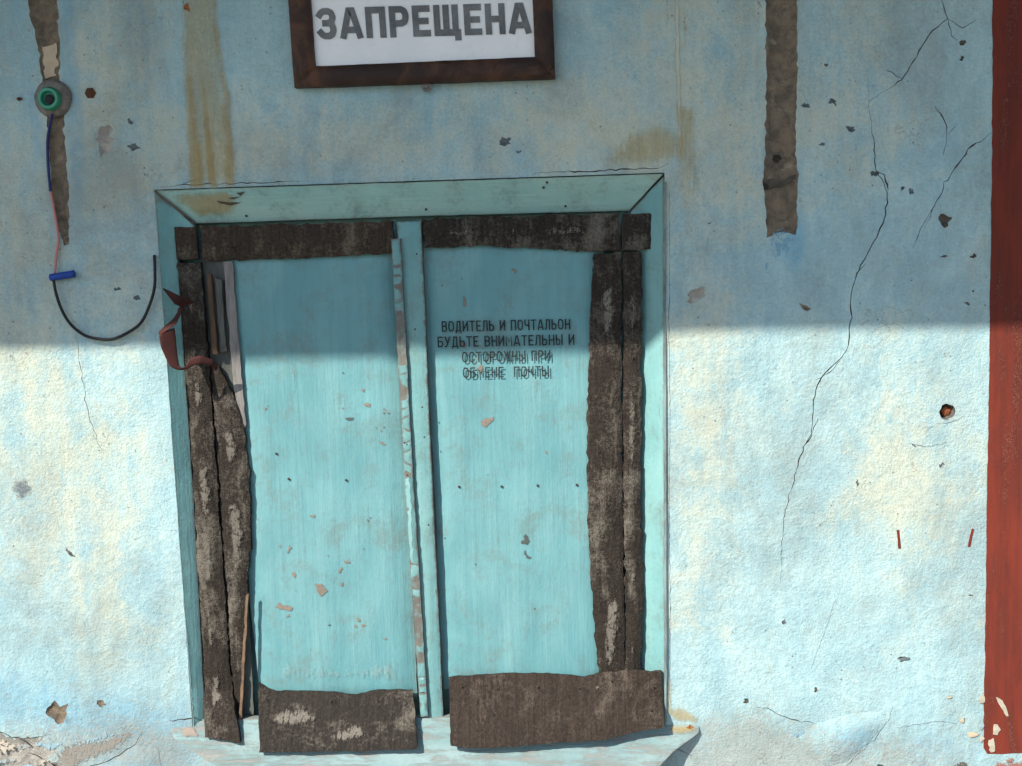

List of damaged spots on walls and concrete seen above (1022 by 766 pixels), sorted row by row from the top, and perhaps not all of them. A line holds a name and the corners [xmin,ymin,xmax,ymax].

spalling [28,0,60,82]
spalling [47,115,70,246]
spalling [762,0,810,238]
crack [914,106,990,245]
crack [780,2,976,581]
peeling [46,700,68,724]
peeling [0,729,131,766]